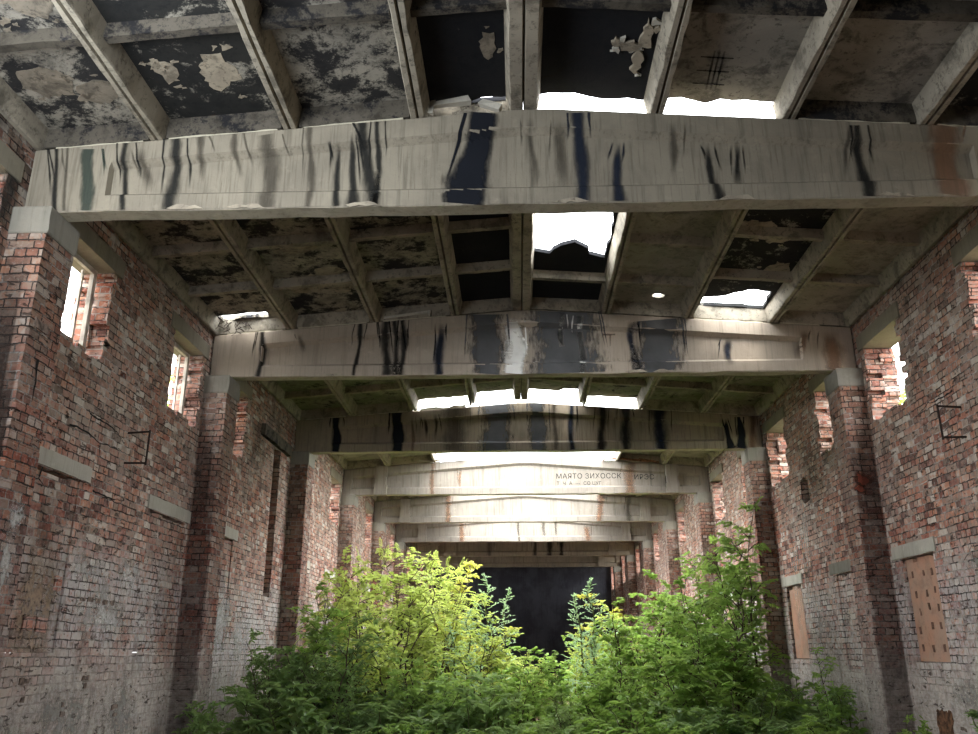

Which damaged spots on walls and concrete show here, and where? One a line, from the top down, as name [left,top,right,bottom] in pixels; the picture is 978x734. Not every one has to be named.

peeling [138,58,187,89]
peeling [199,44,242,91]
spalling [610,17,662,77]
damp [329,121,387,206]
damp [443,112,496,205]
damp [549,112,591,200]
damp [352,320,409,375]
damp [465,310,612,375]
damp [627,318,687,373]
damp [470,403,515,451]
damp [526,403,578,450]
damp [593,407,634,449]